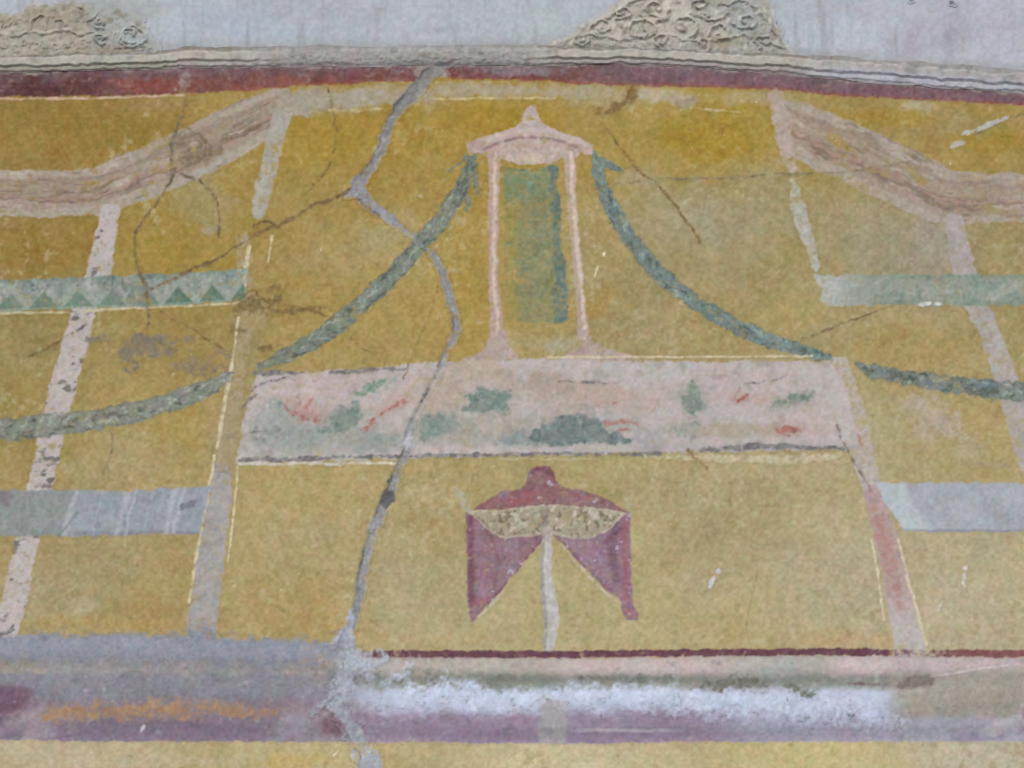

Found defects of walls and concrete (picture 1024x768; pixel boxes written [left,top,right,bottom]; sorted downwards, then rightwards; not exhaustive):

crack [585,80,914,248]
crack [957,111,1024,149]
crack [132,65,463,768]
water stain [334,647,914,738]